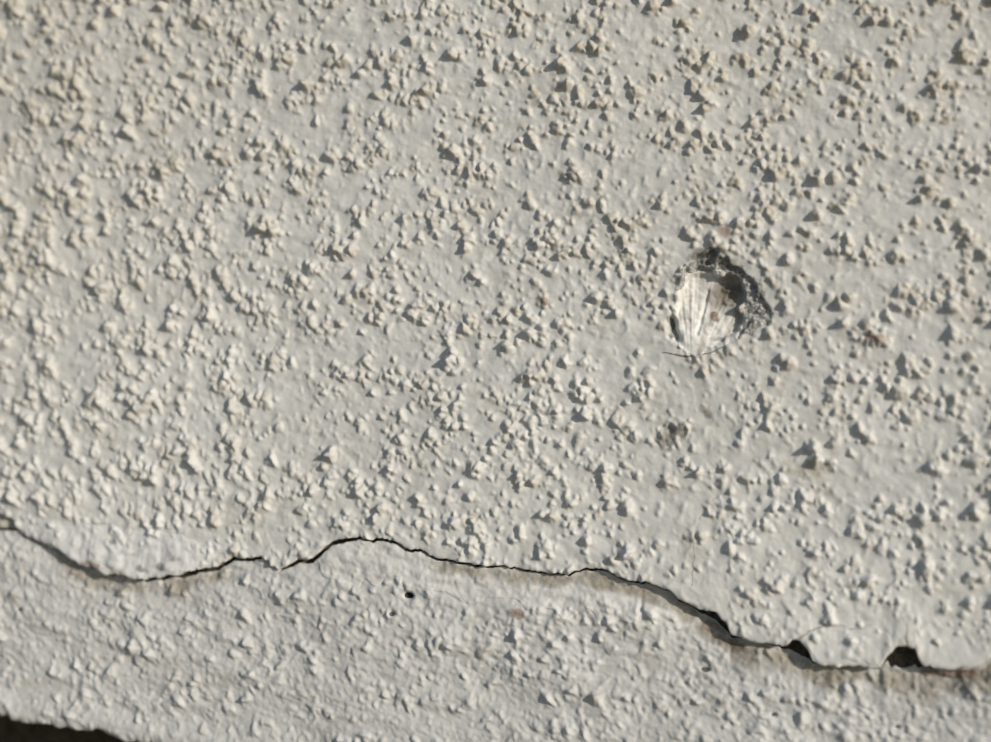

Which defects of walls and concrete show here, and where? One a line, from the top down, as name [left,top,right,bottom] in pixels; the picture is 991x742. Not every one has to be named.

crack [0,528,61,554]
crack [114,492,741,638]
crack [772,624,934,669]